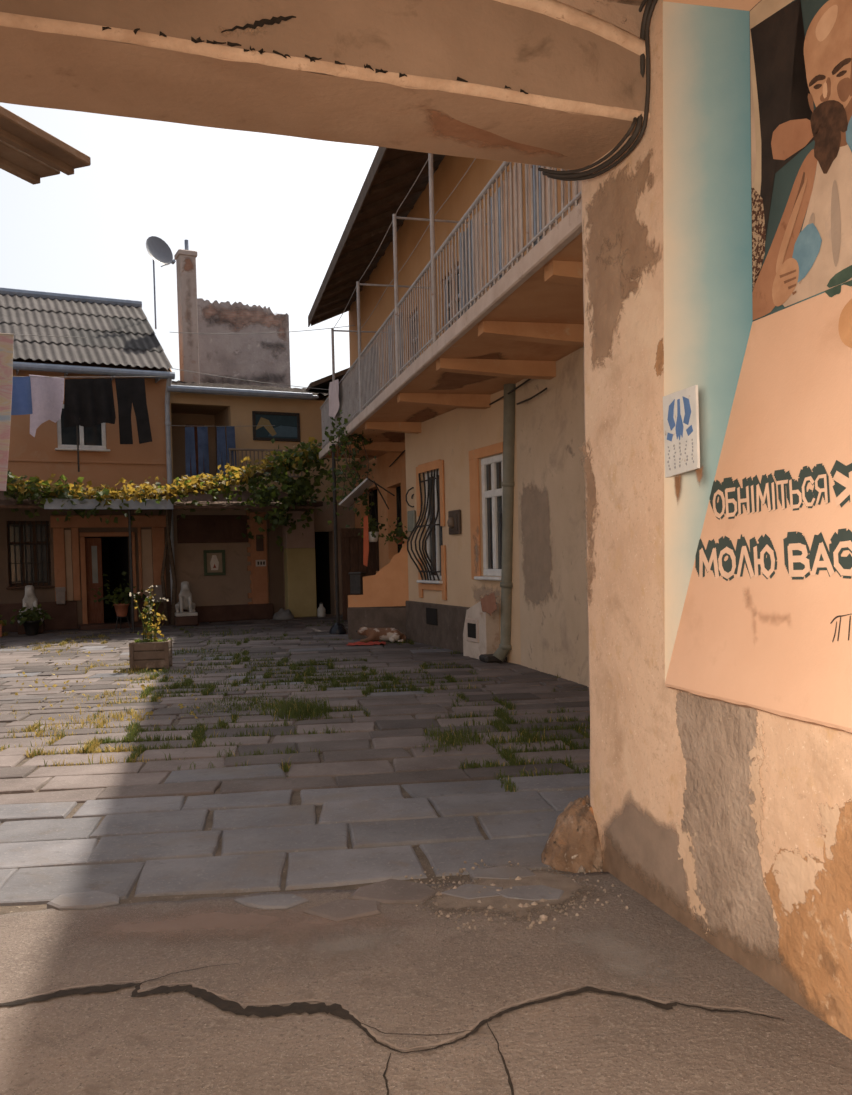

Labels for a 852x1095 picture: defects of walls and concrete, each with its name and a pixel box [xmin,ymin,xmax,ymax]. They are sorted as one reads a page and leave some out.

peeling [583,153,661,367]
peeling [676,690,852,1040]
crack [0,963,785,1095]